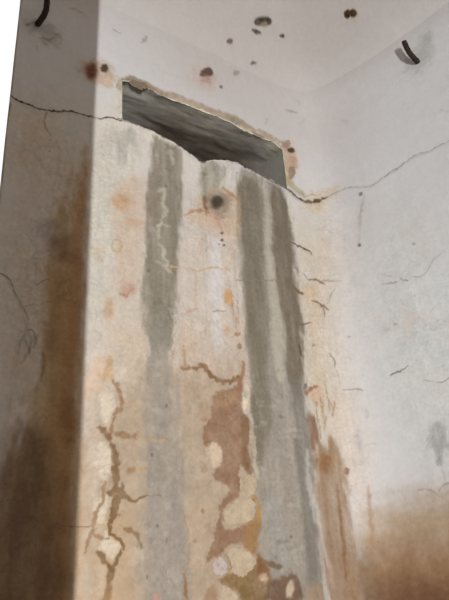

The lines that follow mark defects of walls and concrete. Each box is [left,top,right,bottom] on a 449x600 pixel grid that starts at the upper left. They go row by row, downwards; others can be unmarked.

rust [69,52,124,91]
spalling [246,14,288,42]
crack [5,94,207,164]
spalling [114,73,308,200]
crack [226,140,449,220]
peeling [139,185,175,277]
water stain [0,116,332,600]
peeling [167,307,327,600]
rust [303,379,379,600]